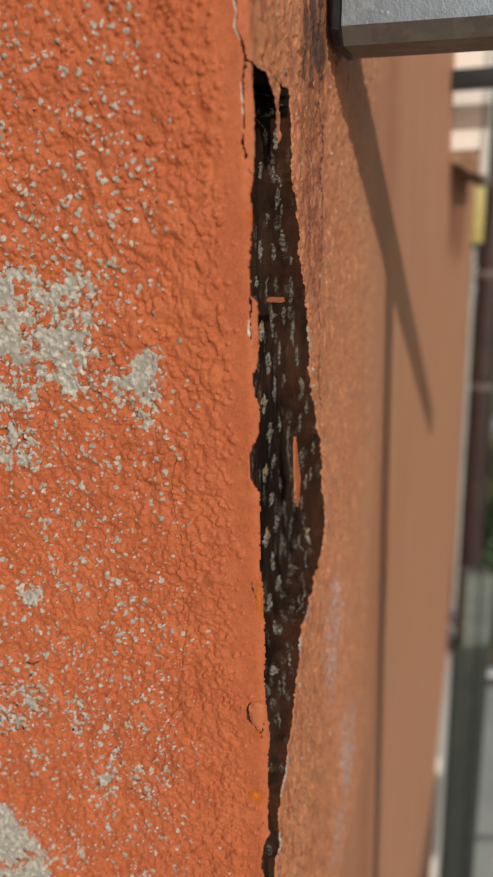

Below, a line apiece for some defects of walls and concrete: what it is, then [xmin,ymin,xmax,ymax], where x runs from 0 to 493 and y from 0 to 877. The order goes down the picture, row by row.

crack [233,0,251,170]
peeling [0,261,167,471]
spalling [248,61,327,877]
peeling [0,803,52,877]